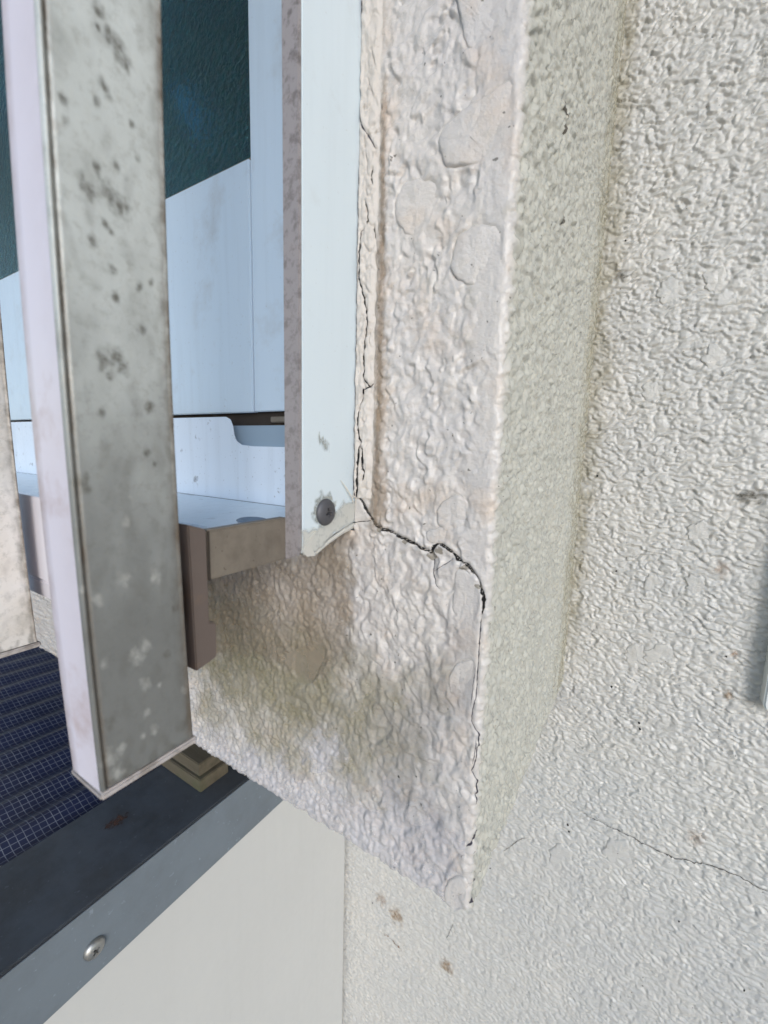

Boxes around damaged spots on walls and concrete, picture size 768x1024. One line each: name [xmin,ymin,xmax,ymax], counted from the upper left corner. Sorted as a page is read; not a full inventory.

crack [352,119,486,846]
crack [563,802,768,892]